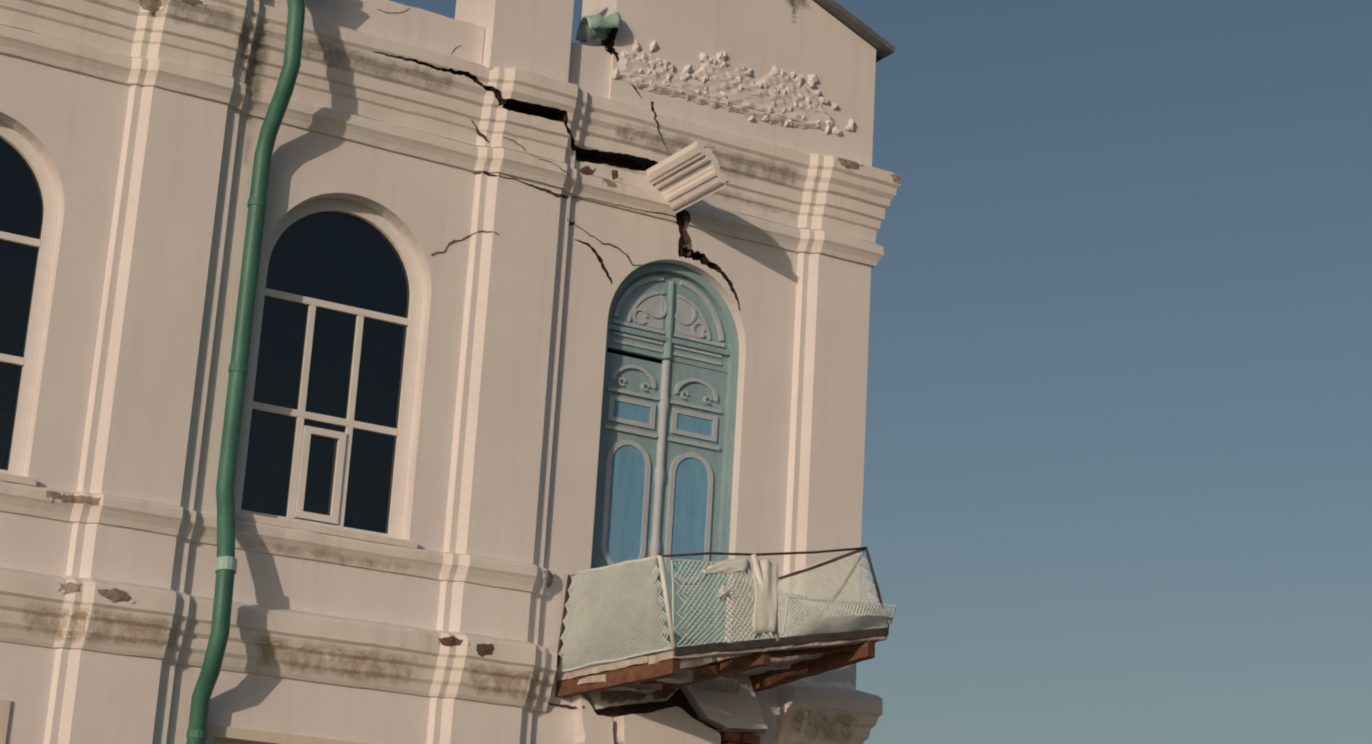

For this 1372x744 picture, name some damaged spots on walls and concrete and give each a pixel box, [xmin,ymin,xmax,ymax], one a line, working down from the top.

spalling [139,0,164,17]
leakage [178,1,262,90]
crack [374,27,740,311]
spalling [46,491,100,506]
spalling [56,582,135,603]
leakage [30,609,167,642]
spalling [435,636,494,657]
leakage [473,669,539,698]
flaking render [716,727,765,744]